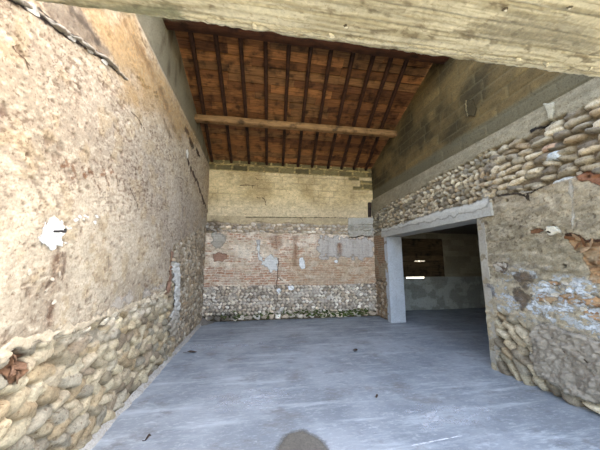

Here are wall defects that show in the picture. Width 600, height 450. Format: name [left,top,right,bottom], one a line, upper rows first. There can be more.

crack [186,149,208,212]
flaking render [576,171,600,186]
flaking render [211,232,227,262]
flaking render [316,235,375,261]
flaking render [564,232,600,284]
flaking render [0,251,174,384]
water stain [488,269,600,334]